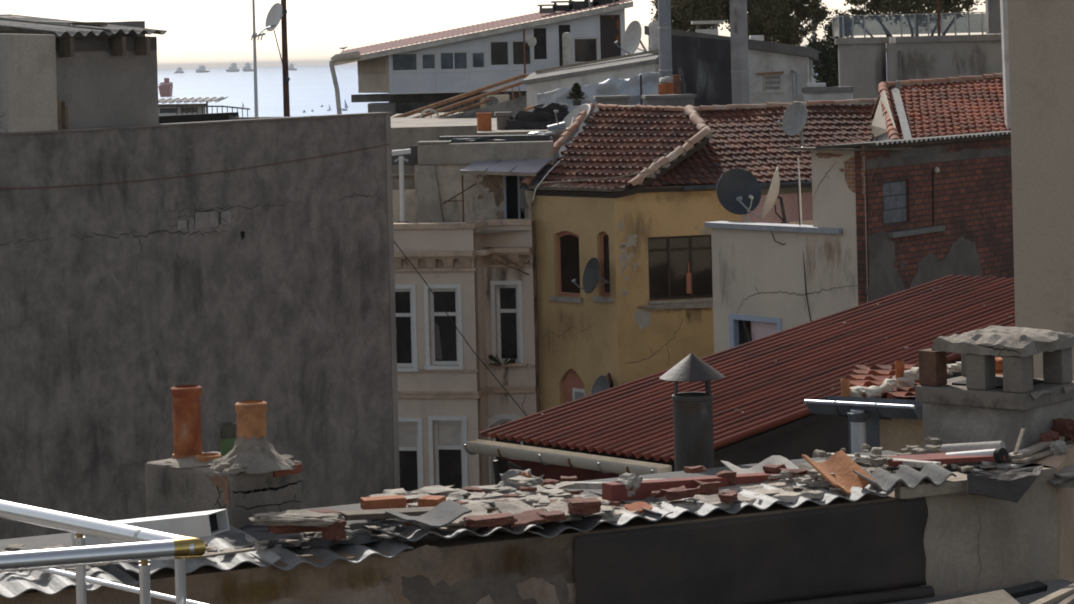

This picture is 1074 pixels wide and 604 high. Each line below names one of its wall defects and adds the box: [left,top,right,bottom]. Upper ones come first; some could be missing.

spalling [816,151,866,195]
crack [1,200,298,248]
crack [737,285,858,313]
crack [205,474,302,512]
flaking render [258,544,577,604]